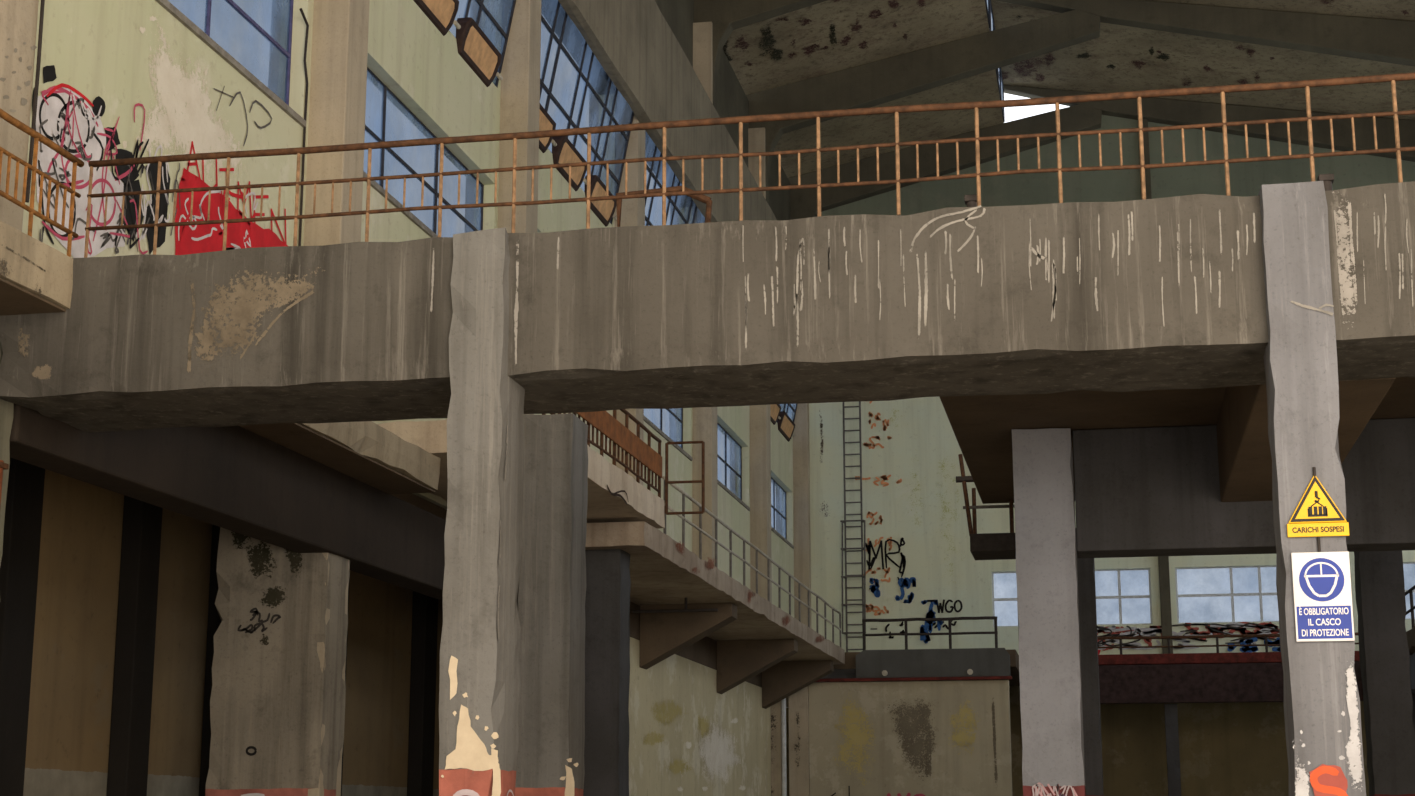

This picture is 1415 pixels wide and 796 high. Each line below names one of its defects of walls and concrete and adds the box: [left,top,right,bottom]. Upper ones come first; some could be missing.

water stain [723,0,909,66]
water stain [258,548,303,609]
peeling [441,656,501,796]
water stain [832,690,998,785]